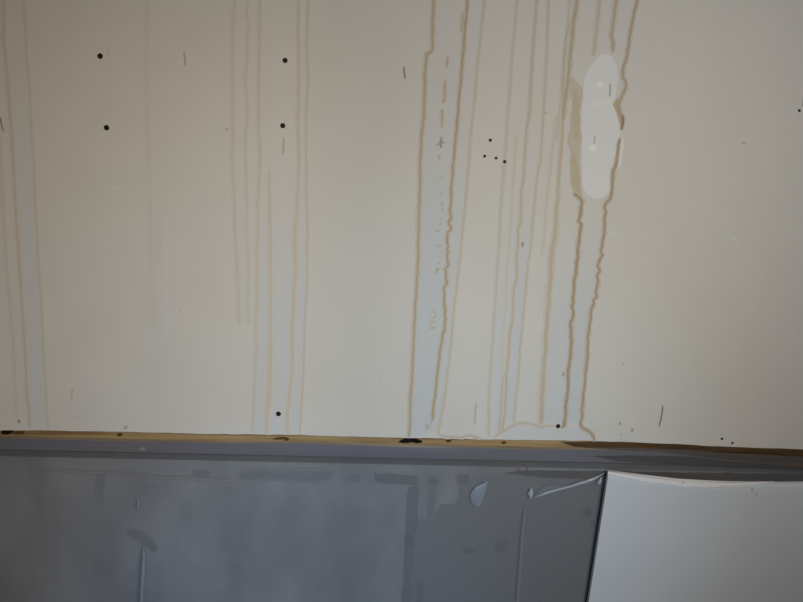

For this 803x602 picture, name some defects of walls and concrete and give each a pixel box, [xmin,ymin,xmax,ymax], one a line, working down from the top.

leakage [0,0,50,429]
leakage [229,0,311,435]
leakage [406,0,640,442]